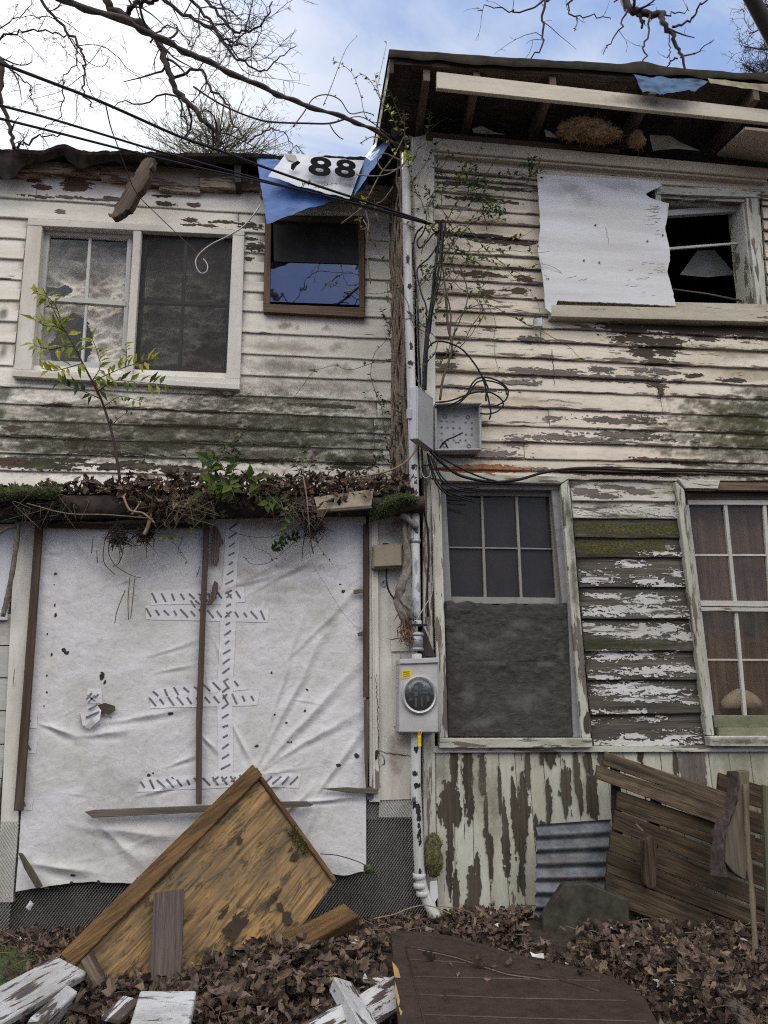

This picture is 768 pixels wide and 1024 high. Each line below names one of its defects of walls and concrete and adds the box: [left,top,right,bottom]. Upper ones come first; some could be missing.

peeling [16,177,120,214]
peeling [435,180,538,204]
peeling [152,194,265,261]
peeling [437,230,536,251]
peeling [448,270,535,295]
peeling [456,323,768,401]
leakage [0,387,391,469]
leakage [566,504,679,556]
peeling [436,545,707,927]